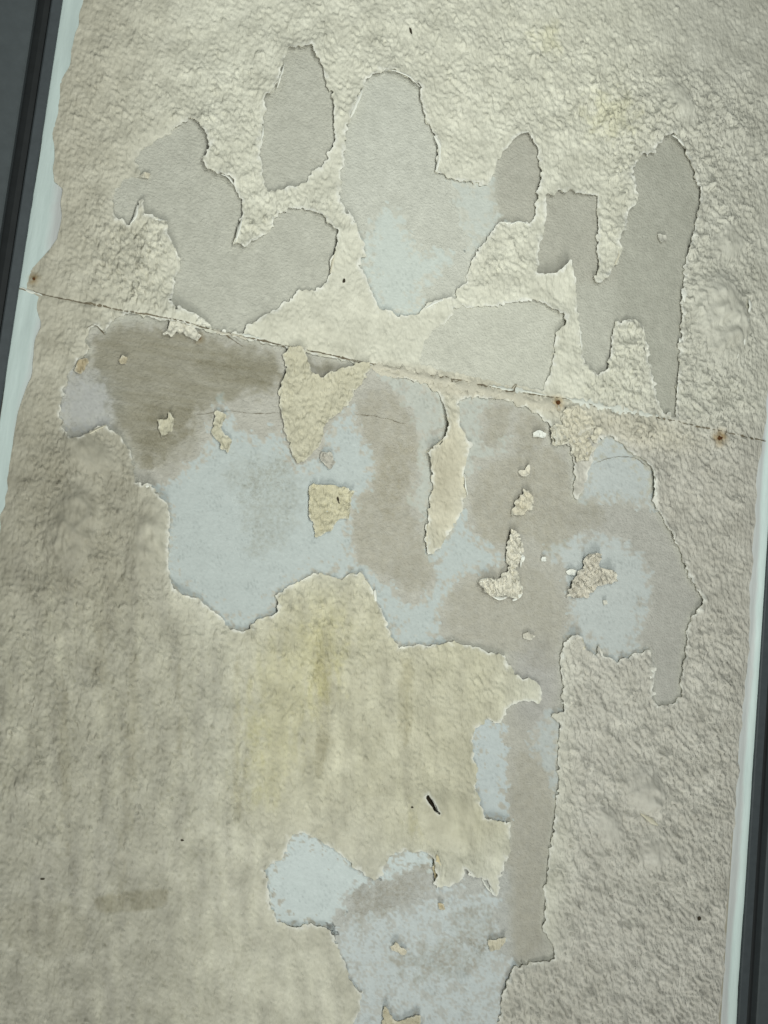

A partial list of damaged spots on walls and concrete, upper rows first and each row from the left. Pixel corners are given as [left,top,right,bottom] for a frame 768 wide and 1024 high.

crack [19,287,764,441]
peeling [259,44,701,417]
peeling [59,117,703,1024]